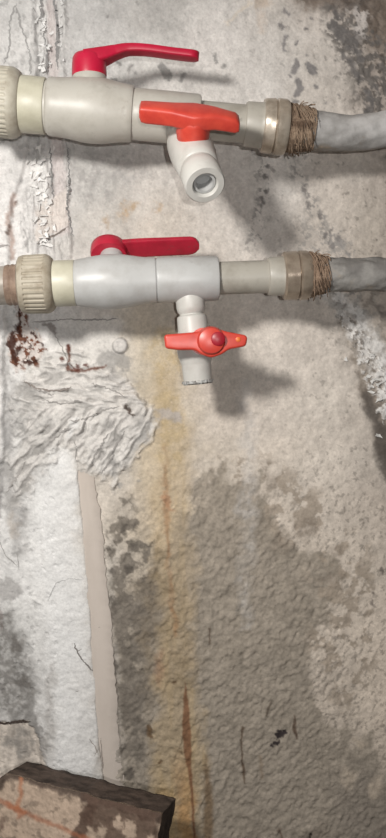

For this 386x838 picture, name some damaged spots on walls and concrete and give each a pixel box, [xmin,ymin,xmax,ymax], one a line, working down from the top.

crack [4,0,60,75]
peeling [31,0,64,73]
damp [277,0,386,114]
peeling [12,143,71,248]
crack [49,148,74,236]
rust [4,305,50,375]
rust [58,343,108,375]
spalling [121,402,136,418]
damp [318,291,386,486]
damp [102,477,162,791]
rust [140,319,214,838]
damp [190,376,386,838]